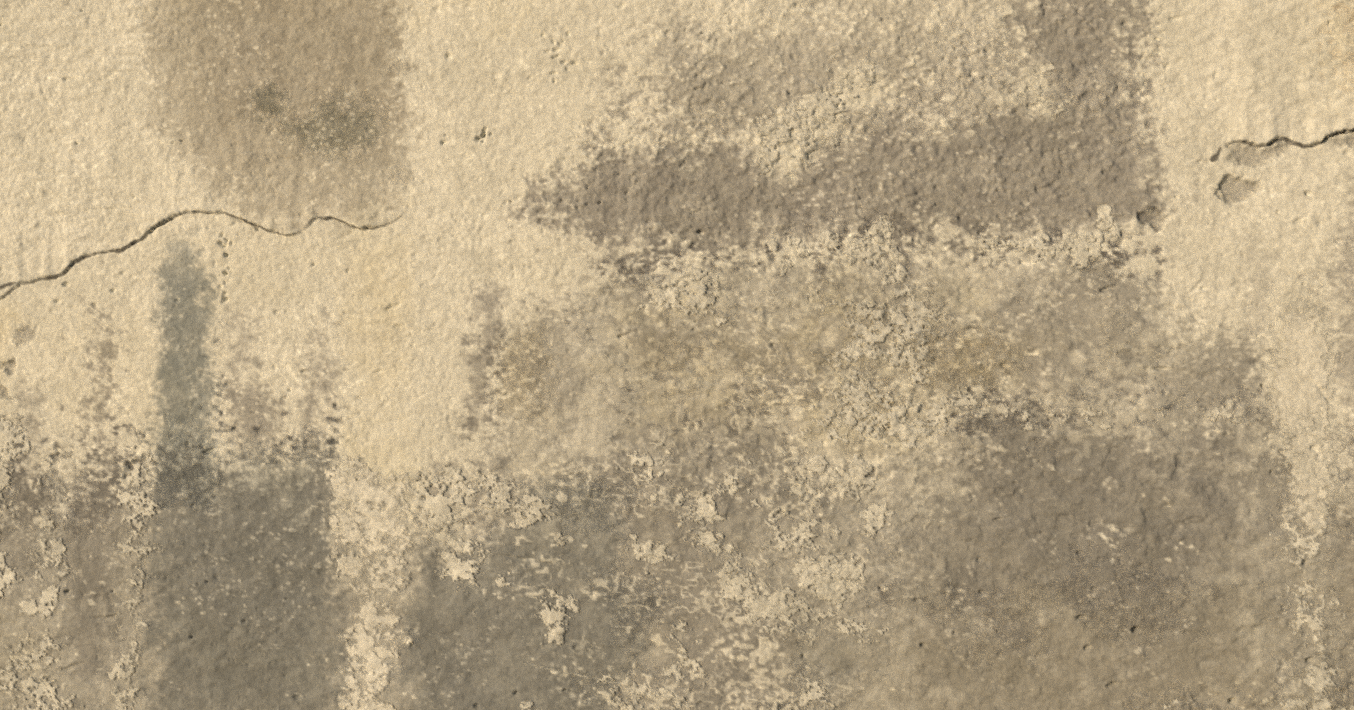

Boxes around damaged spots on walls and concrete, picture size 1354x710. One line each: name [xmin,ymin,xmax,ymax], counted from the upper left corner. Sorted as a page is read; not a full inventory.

crack [1211,129,1354,161]
crack [0,213,185,289]